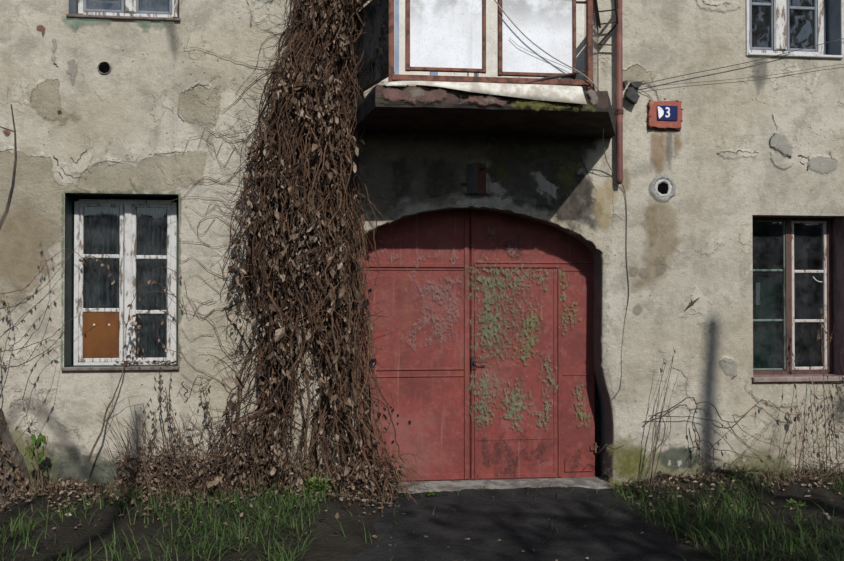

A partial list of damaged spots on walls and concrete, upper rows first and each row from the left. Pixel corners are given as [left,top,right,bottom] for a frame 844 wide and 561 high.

spalling [36,25,58,67]
spalling [30,78,80,124]
spalling [178,79,221,126]
leakage [355,133,512,224]
leakage [531,172,600,219]
flaking render [0,129,206,313]